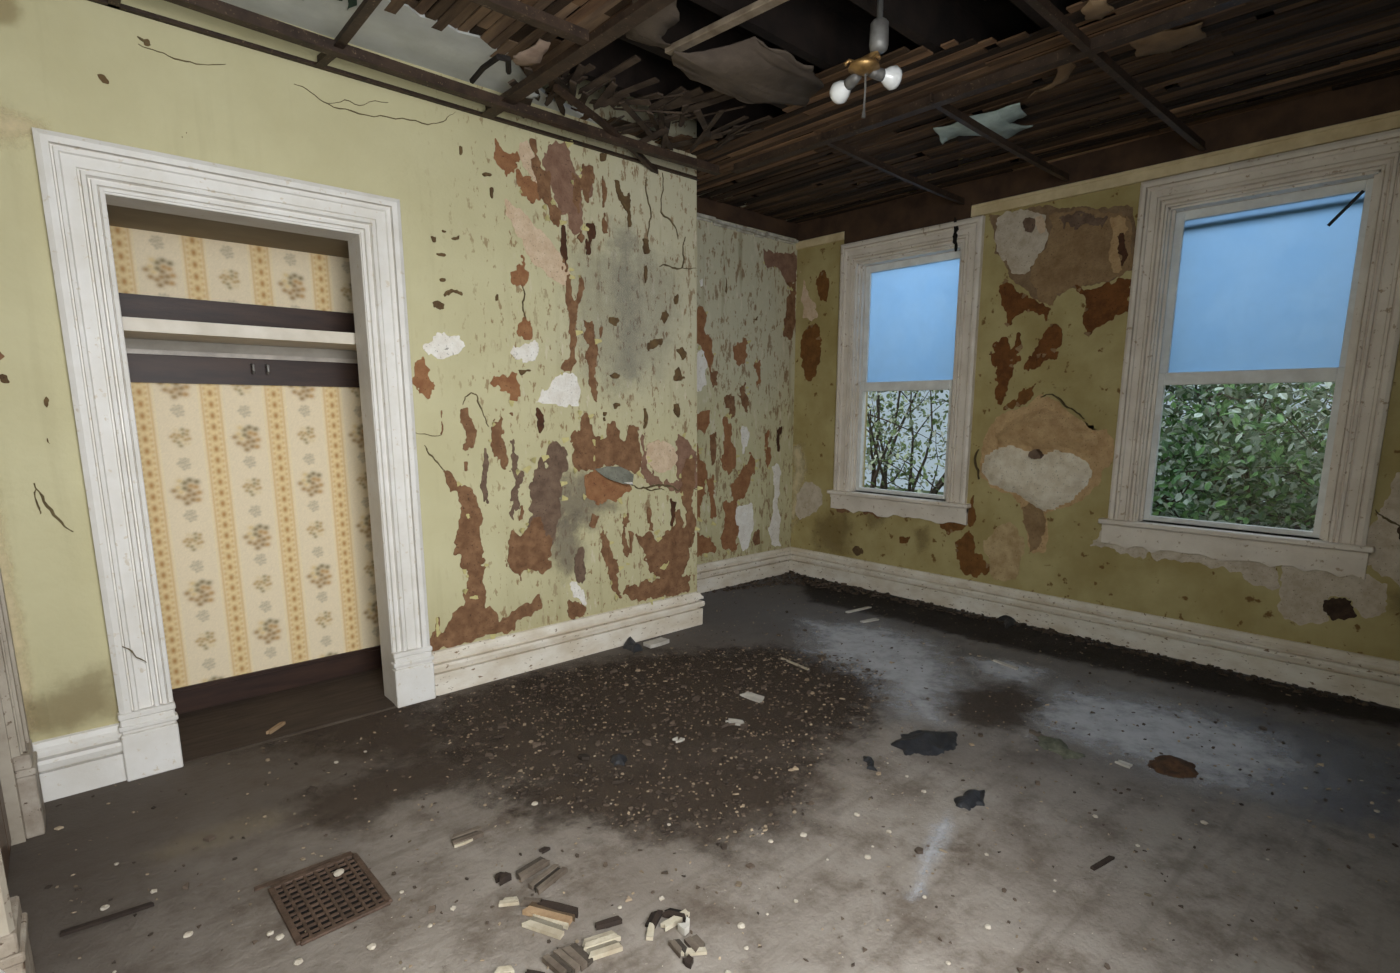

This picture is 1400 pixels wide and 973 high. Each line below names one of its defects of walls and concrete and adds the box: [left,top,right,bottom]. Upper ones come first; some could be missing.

crack [137,36,226,65]
crack [294,84,453,125]
flaking render [989,205,1136,410]
flaking render [412,332,465,434]
peeling [430,138,879,651]
peeling [940,495,1046,581]
flaking render [1090,472,1400,626]